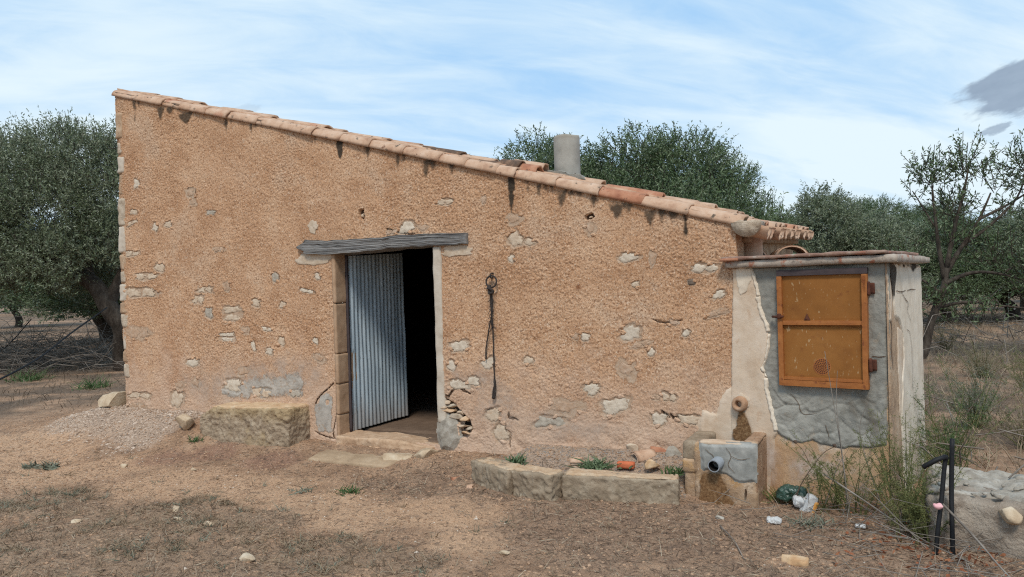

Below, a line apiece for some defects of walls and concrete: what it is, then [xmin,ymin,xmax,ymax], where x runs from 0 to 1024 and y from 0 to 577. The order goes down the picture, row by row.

water stain [157,107,192,123]
water stain [508,177,596,211]
water stain [611,204,632,217]
water stain [645,209,688,234]
spalling [115,113,166,378]
flaking render [580,322,656,420]
flaking render [222,377,272,400]
flaking render [441,338,497,435]
water stain [732,411,752,441]